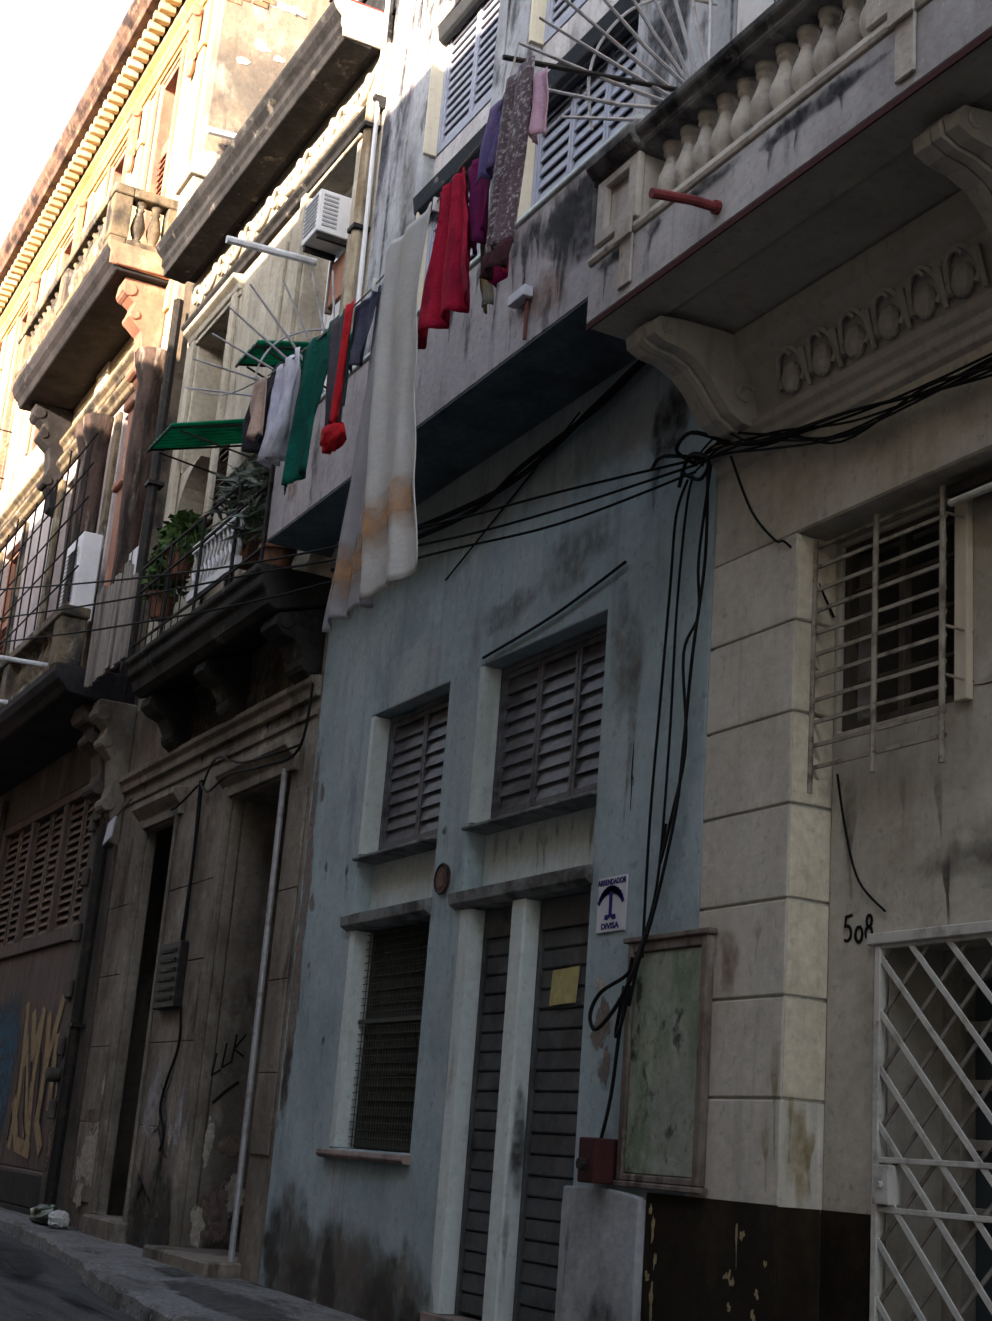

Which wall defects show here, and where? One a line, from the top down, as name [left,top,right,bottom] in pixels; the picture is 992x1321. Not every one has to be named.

flaking render [227,0,305,17]
damp [399,0,452,116]
damp [649,0,689,105]
damp [264,1187,428,1321]
peeling [645,1204,657,1321]